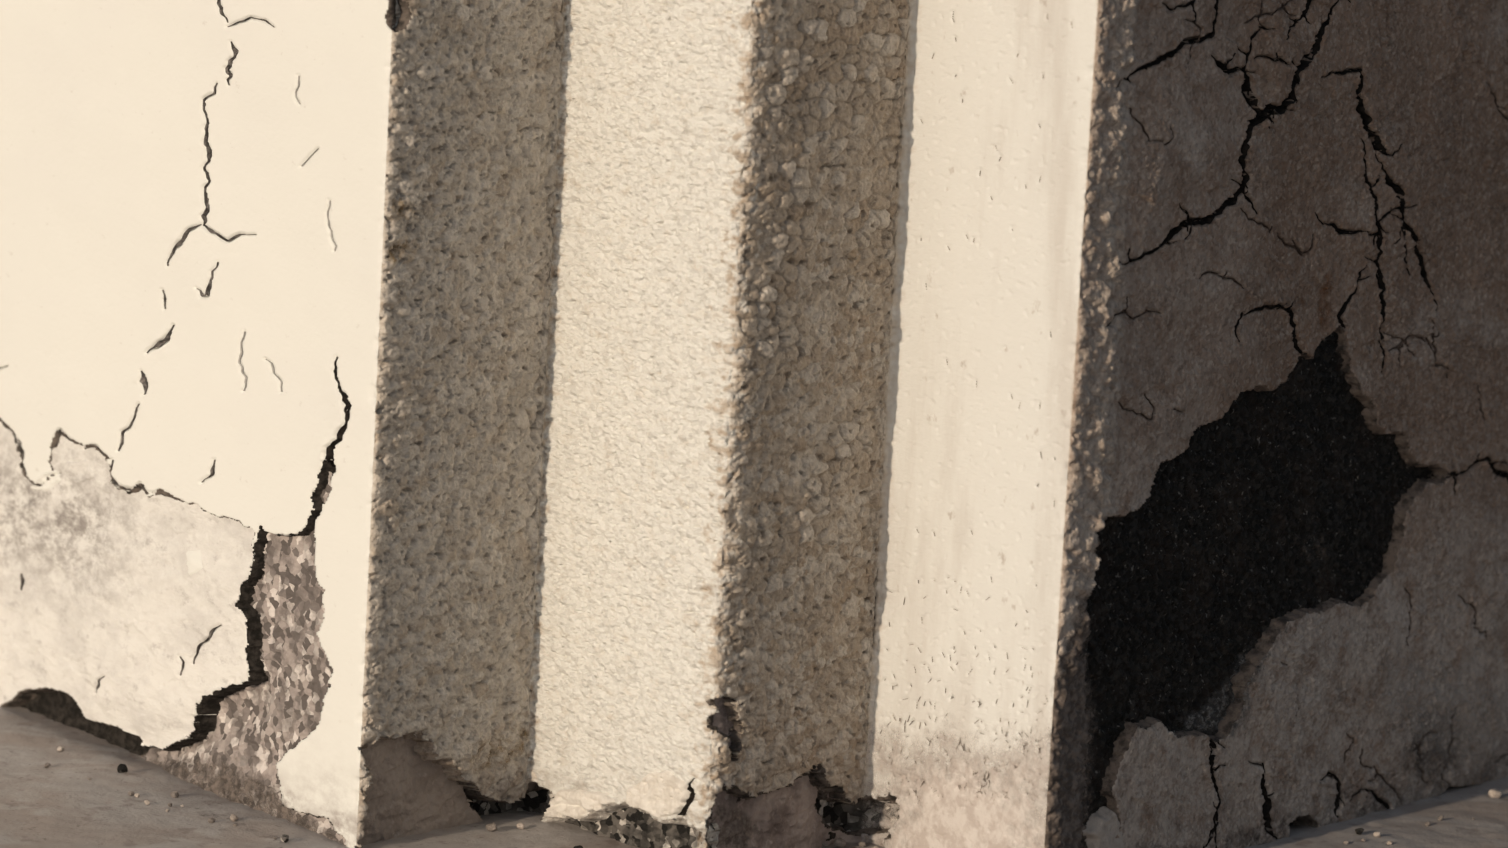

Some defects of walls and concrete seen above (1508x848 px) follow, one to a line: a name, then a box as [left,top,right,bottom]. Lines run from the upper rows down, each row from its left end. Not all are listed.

crack [293,75,301,104]
crack [118,0,274,451]
crack [327,200,337,251]
crack [1107,0,1508,495]
crack [238,331,283,392]
peeling [0,417,1064,848]
flaking render [1076,325,1449,848]
crack [1404,588,1412,646]
crack [1458,595,1487,643]
crack [1203,740,1278,848]
crack [1321,711,1456,822]